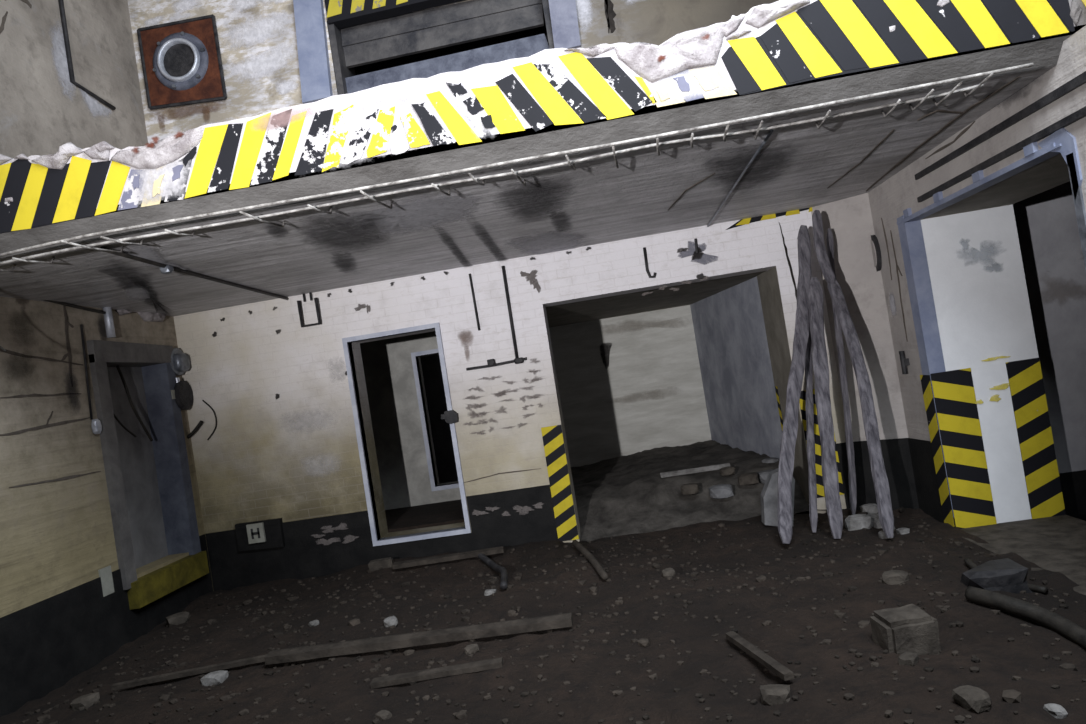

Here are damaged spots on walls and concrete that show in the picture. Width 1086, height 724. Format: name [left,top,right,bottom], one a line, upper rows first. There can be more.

crack [0,0,32,34]
crack [603,0,611,33]
flaking render [1070,0,1082,26]
flaking render [228,0,293,79]
flaking render [564,0,810,101]
spalling [0,63,1034,272]
water stain [712,150,787,186]
water stain [504,180,582,254]
water stain [475,227,505,260]
peeling [465,359,542,434]
peeling [472,502,543,516]
peeling [311,523,358,545]